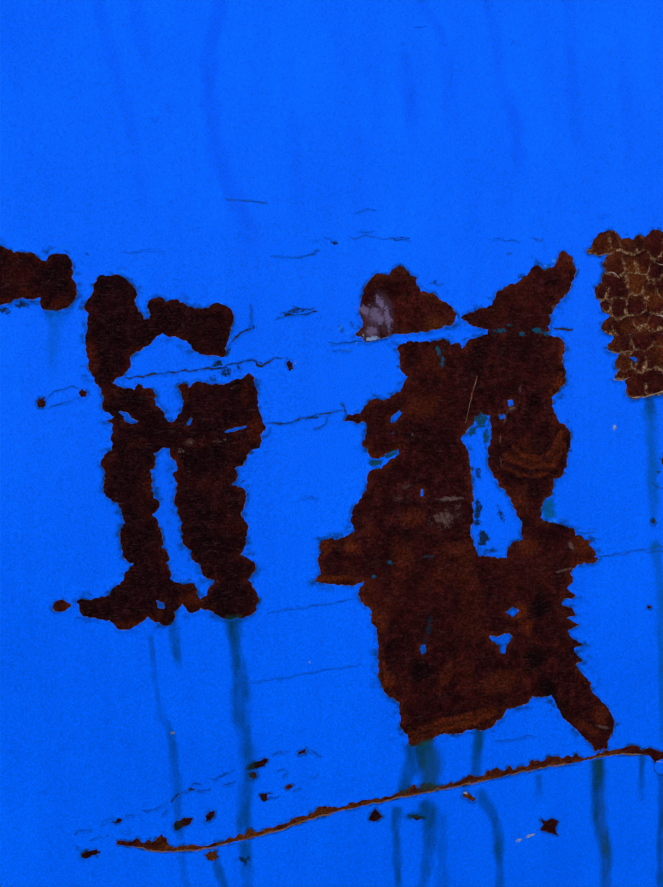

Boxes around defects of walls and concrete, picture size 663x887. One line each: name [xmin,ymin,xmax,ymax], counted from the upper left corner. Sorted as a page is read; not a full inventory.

peeling [293,745,309,758]
peeling [244,756,271,783]
peeling [258,782,295,802]
peeling [111,813,124,826]
peeling [171,807,218,834]
peeling [77,846,103,863]
rust [601,834,609,858]